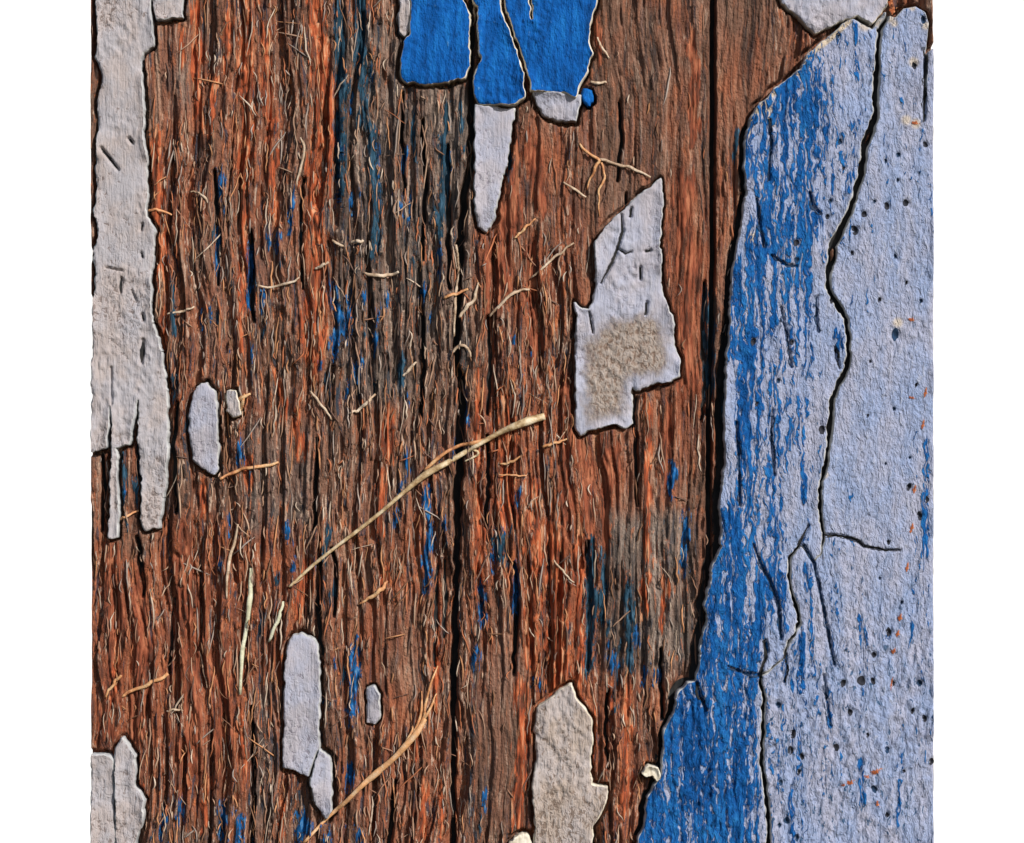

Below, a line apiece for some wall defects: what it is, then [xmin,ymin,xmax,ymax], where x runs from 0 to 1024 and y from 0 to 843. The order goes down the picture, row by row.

peeling [398,0,598,233]
peeling [90,0,186,539]
peeling [573,178,681,436]
peeling [188,382,242,475]
crack [727,16,900,843]
peeling [90,736,148,843]
peeling [282,631,334,819]
peeling [366,683,382,724]
peeling [508,682,608,843]